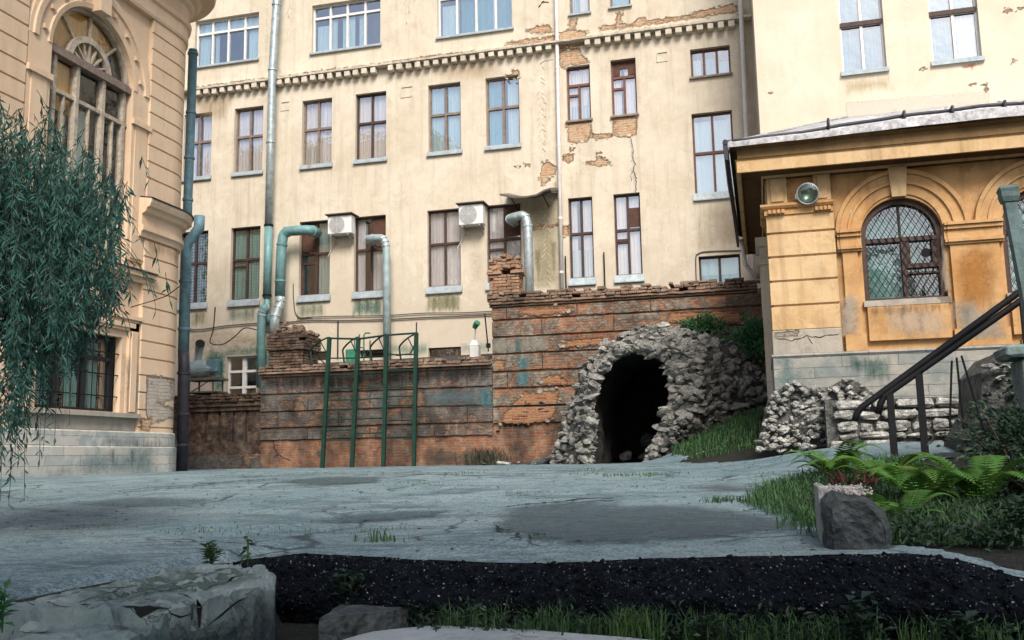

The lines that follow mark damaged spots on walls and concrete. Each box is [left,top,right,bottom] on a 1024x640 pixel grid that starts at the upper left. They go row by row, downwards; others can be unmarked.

flaking render [504,2,739,69]
flaking render [514,66,639,187]
crack [629,138,637,192]
flaking render [140,374,175,431]
flaking render [482,373,568,435]